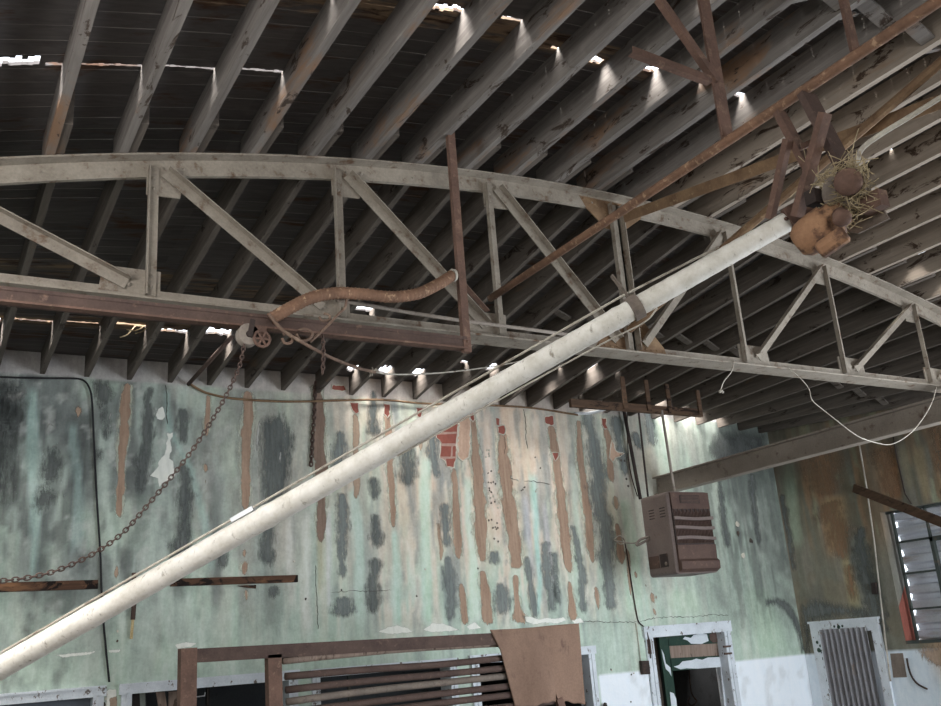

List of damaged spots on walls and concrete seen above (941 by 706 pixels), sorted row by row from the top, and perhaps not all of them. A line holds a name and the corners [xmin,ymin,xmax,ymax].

leakage [36,445,62,511]
peeling [150,432,175,487]
leakage [331,431,346,467]
leakage [368,478,381,499]
spalling [436,421,458,468]
leakage [333,597,354,617]
leakage [336,494,352,577]
leakage [365,515,385,612]
leakage [524,542,561,617]
leakage [572,526,587,611]